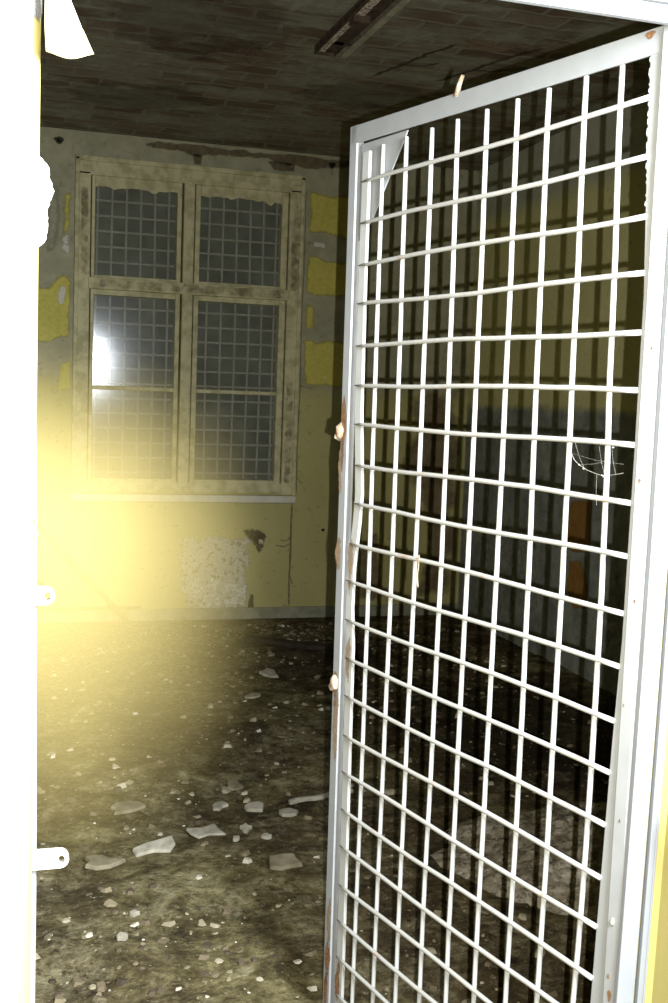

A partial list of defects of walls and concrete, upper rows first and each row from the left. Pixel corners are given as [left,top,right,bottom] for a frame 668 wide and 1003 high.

peeling [0,0,94,59]
peeling [37,276,71,342]
peeling [292,193,348,387]
peeling [178,529,266,608]